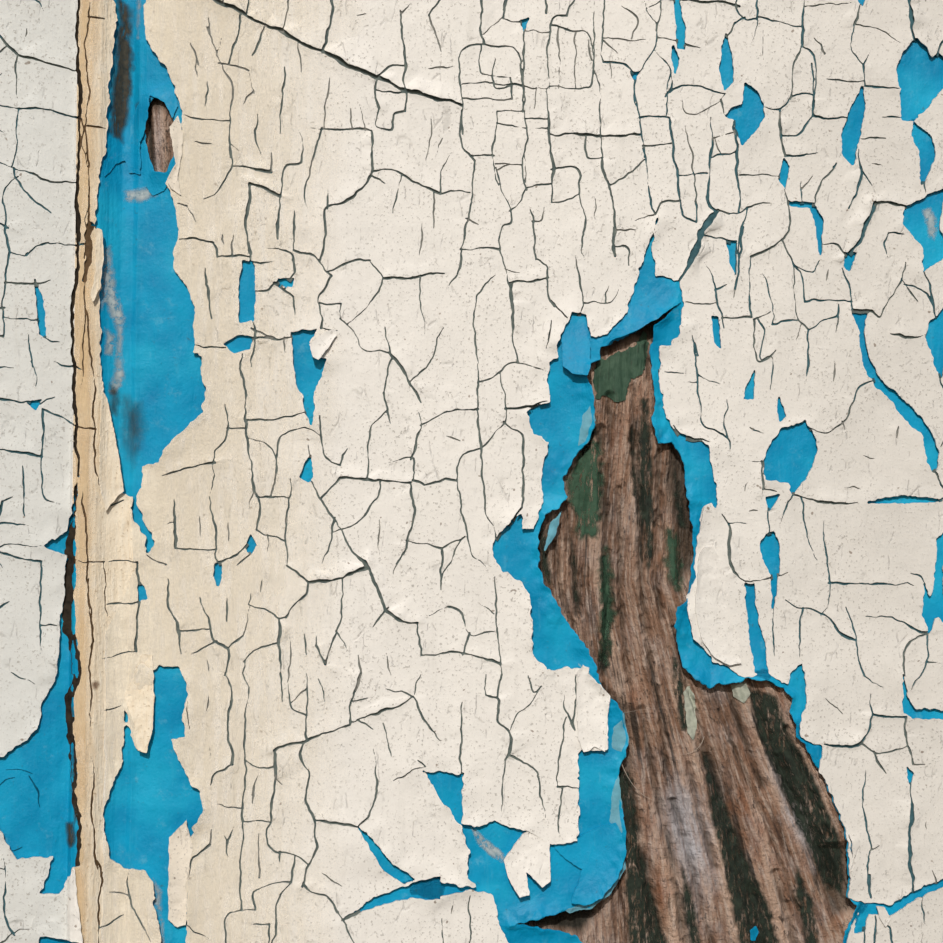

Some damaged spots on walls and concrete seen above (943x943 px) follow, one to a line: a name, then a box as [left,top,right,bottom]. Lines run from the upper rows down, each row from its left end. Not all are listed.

peeling [90,0,206,553]
crack [670,0,851,157]
crack [686,189,937,388]
crack [828,4,900,89]
crack [822,137,907,258]
peeling [896,38,943,181]
peeling [903,189,943,272]
peeling [0,483,83,943]
crack [0,0,166,943]
peeling [103,654,203,943]
peeling [348,218,943,943]
crack [722,461,938,943]